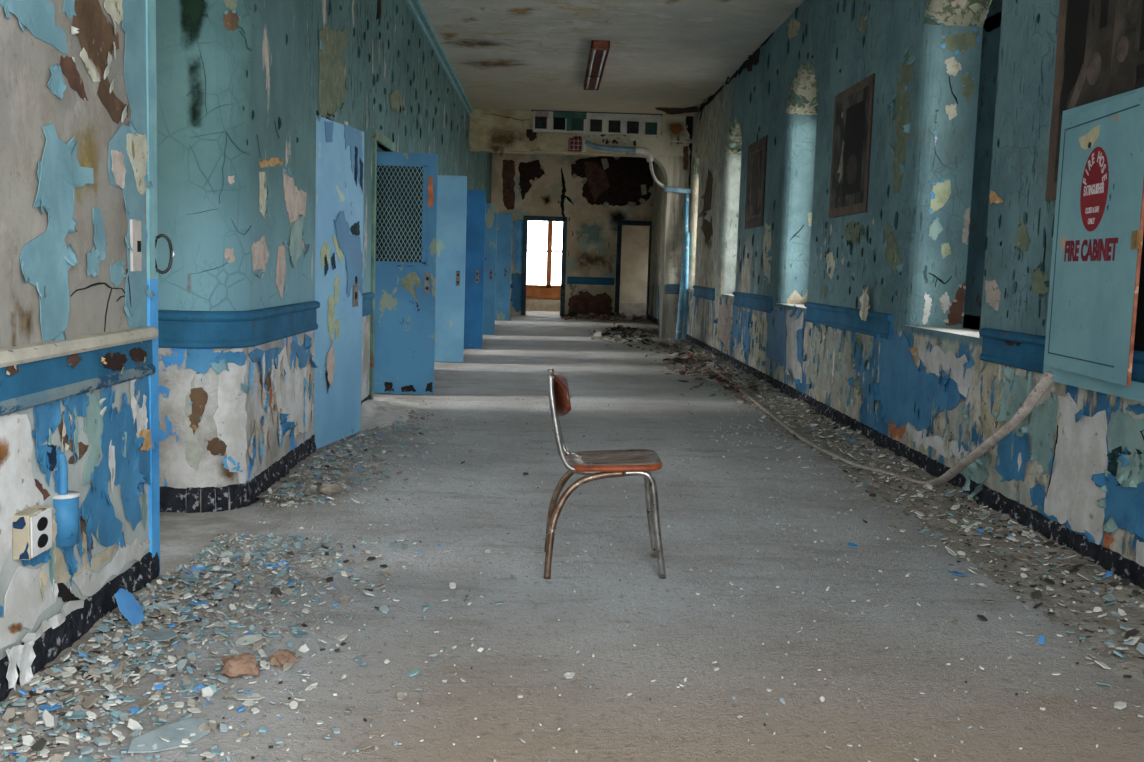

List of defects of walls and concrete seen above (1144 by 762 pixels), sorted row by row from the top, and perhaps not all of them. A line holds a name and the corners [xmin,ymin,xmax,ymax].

crack [186,41,280,235]
flaking render [184,157,363,486]
flaking render [502,143,545,313]
flaking render [569,133,657,209]
peeling [714,48,1144,567]
peeling [933,24,980,143]
peeling [951,0,984,16]